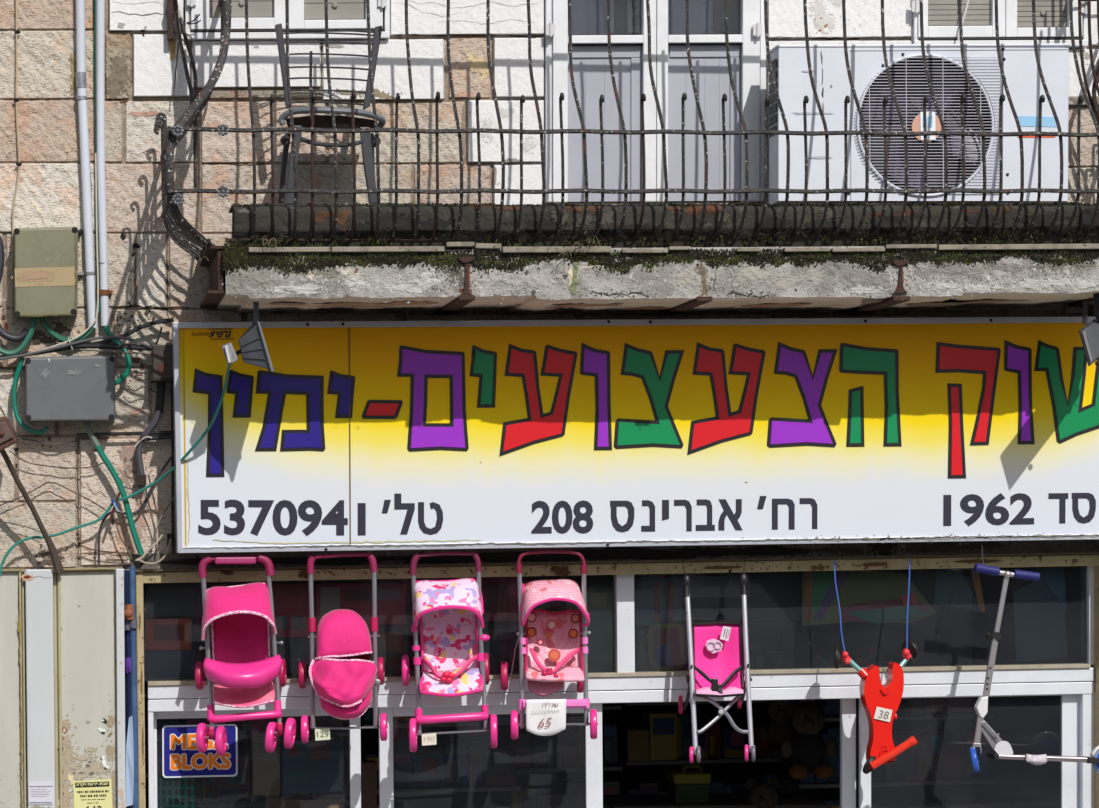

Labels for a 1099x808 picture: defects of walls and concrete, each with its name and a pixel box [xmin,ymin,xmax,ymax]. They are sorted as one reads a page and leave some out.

peeling [796,0,876,34]